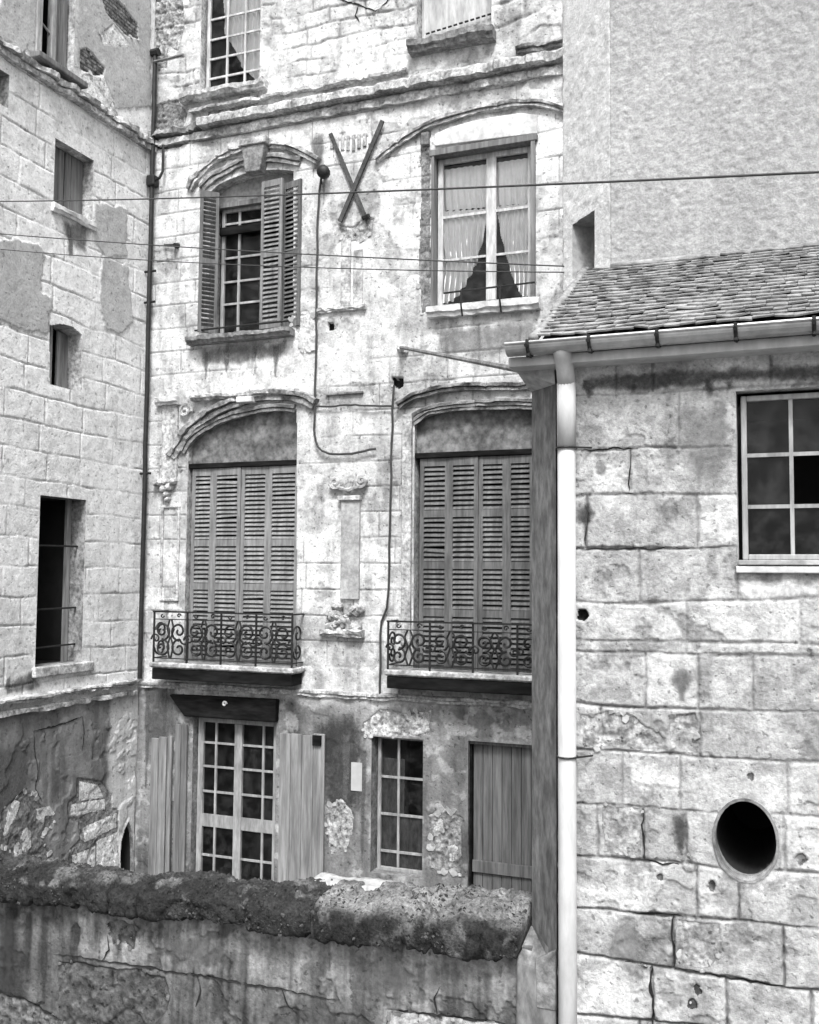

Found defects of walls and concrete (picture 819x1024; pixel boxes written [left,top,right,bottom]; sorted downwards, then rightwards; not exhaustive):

spalling [80,0,140,116]
damp [673,669,690,699]
flaking render [0,778,119,867]
flaking render [324,799,354,854]
flaking render [426,805,463,877]
crack [56,936,338,1013]